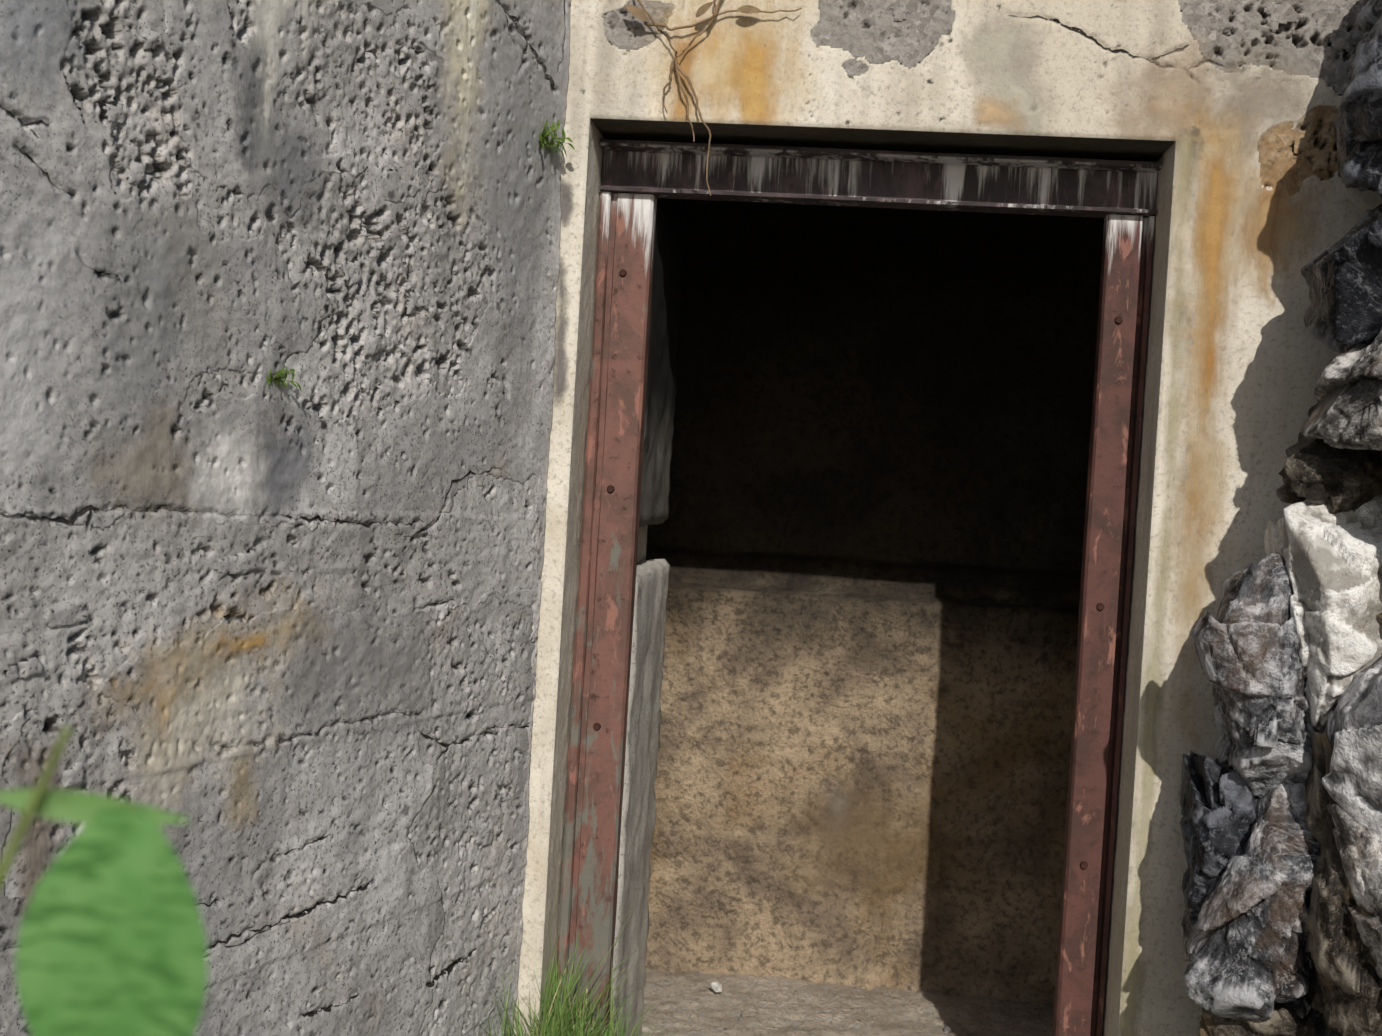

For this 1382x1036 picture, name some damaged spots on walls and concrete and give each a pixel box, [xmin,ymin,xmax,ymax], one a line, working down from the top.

crack [495,0,565,91]
spalling [602,0,675,52]
corrosion [672,14,773,121]
spalling [810,0,955,77]
crack [1009,15,1234,85]
spalling [1178,0,1362,196]
corrosion [1182,115,1303,534]
crack [0,467,498,539]
crack [218,711,529,764]
crack [207,882,372,957]
crack [426,948,477,987]
crack [301,994,359,1017]